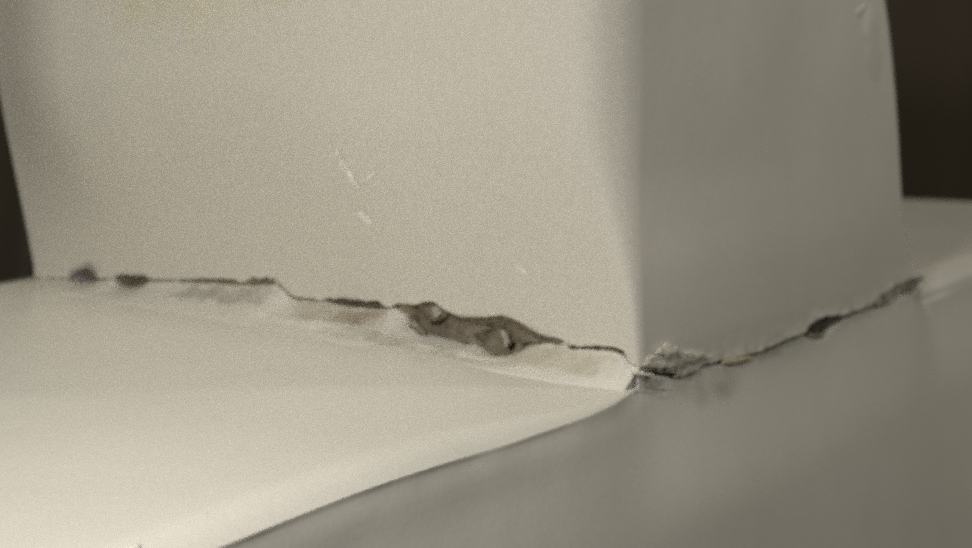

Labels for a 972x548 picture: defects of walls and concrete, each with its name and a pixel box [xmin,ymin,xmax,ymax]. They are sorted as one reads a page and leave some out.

crack [157,277,400,309]
spalling [400,302,570,356]
crack [572,335,800,378]